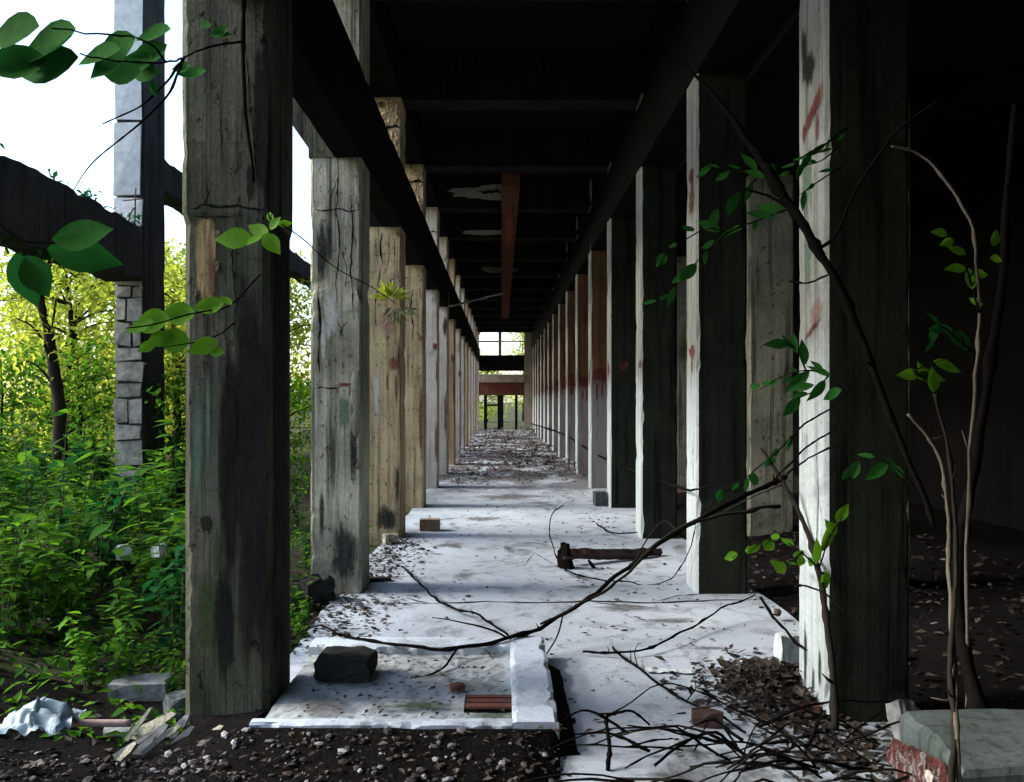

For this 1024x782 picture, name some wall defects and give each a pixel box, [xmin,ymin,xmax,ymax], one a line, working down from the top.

crack [191,39,265,218]
rust [803,87,821,143]
spalling [447,184,502,200]
crack [315,158,395,389]
damp [332,524,355,578]